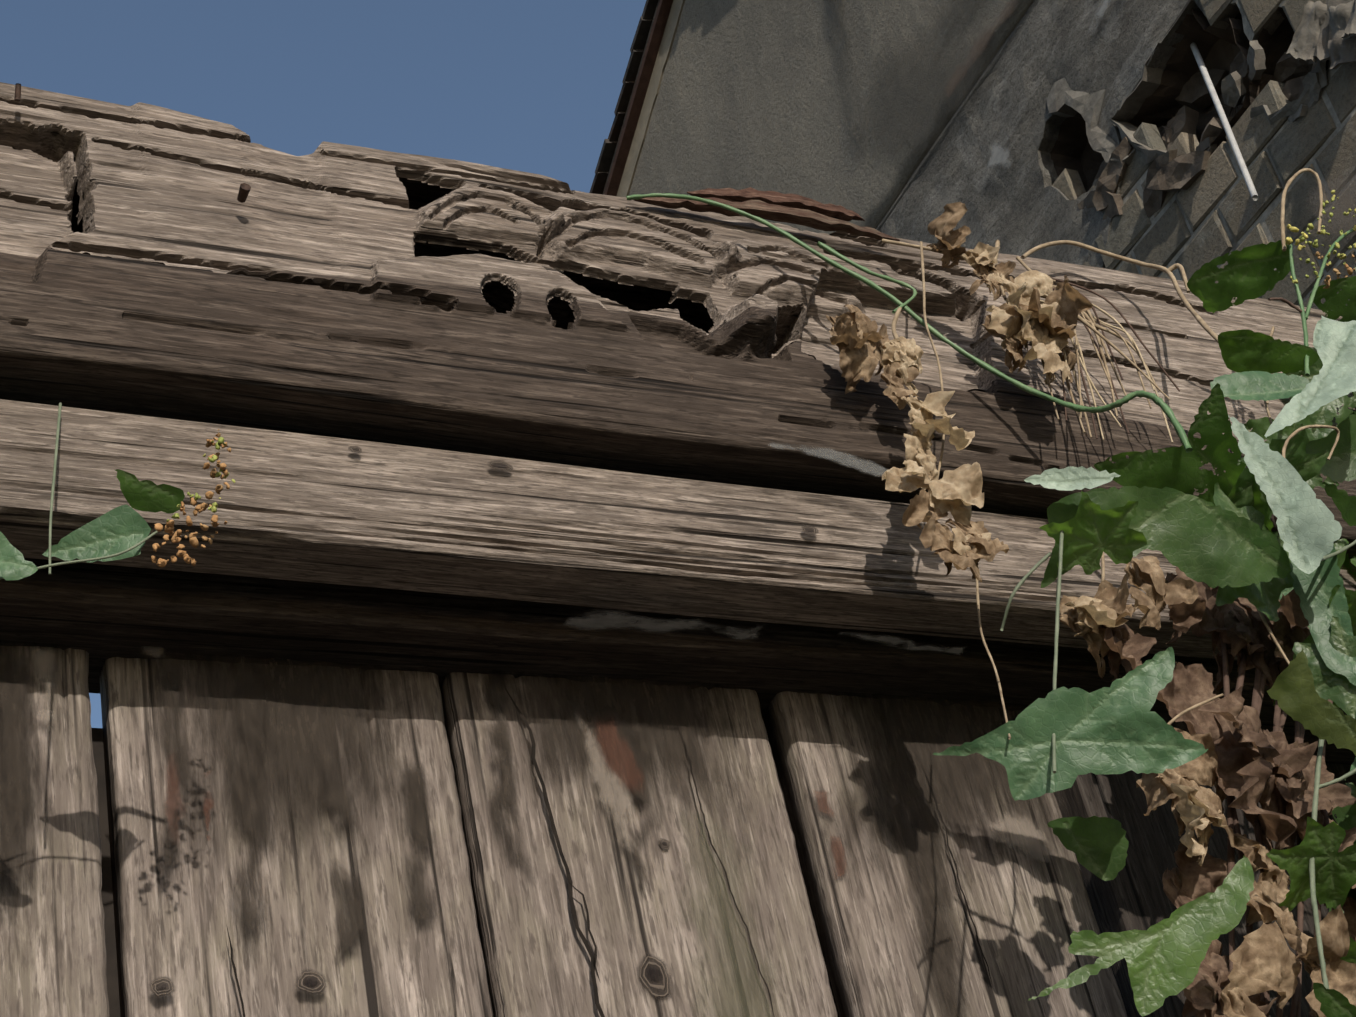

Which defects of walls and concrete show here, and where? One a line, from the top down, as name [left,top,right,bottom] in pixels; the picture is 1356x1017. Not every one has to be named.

peeling [989,146,1010,166]
spalling [1047,9,1329,219]
peeling [1313,175,1356,235]
crack [502,674,605,1017]